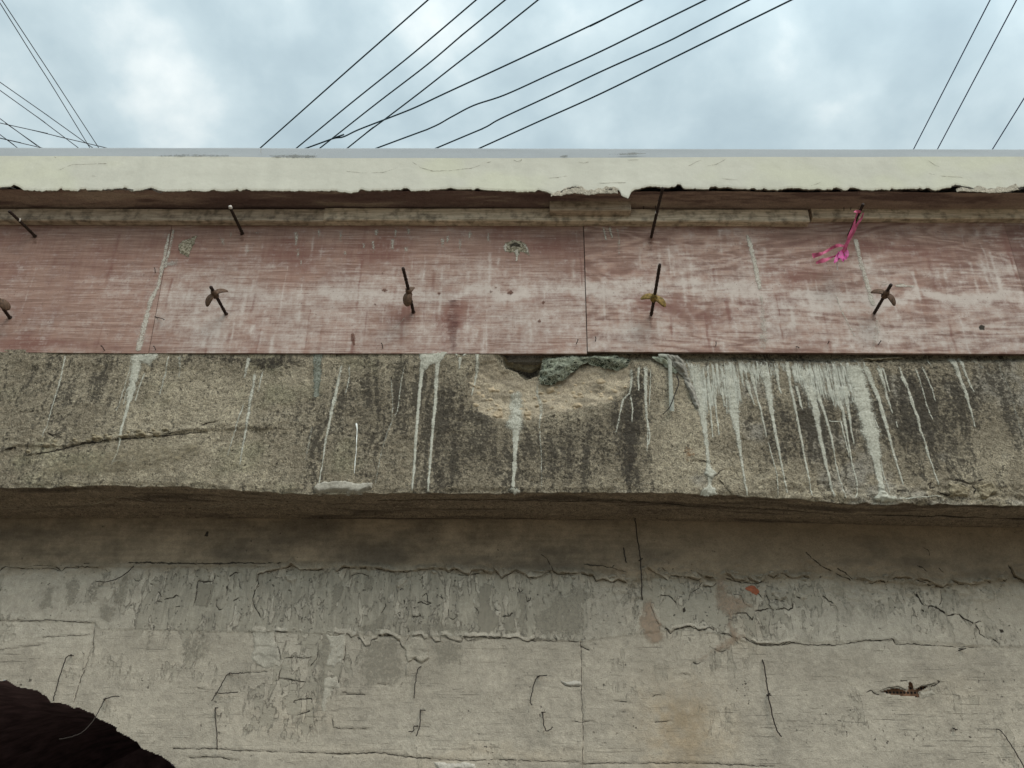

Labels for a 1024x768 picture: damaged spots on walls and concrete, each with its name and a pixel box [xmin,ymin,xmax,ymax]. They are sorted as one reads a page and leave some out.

crack [5,421,216,456]
leakage [112,231,174,462]
leakage [379,356,464,501]
leakage [450,407,521,501]
spalling [467,355,635,430]
leakage [531,358,1023,519]
crack [1,561,281,571]
flaking render [251,556,630,711]
flaking render [651,583,712,634]
crack [684,593,998,674]
flaking render [852,565,1024,589]
crack [173,640,773,767]